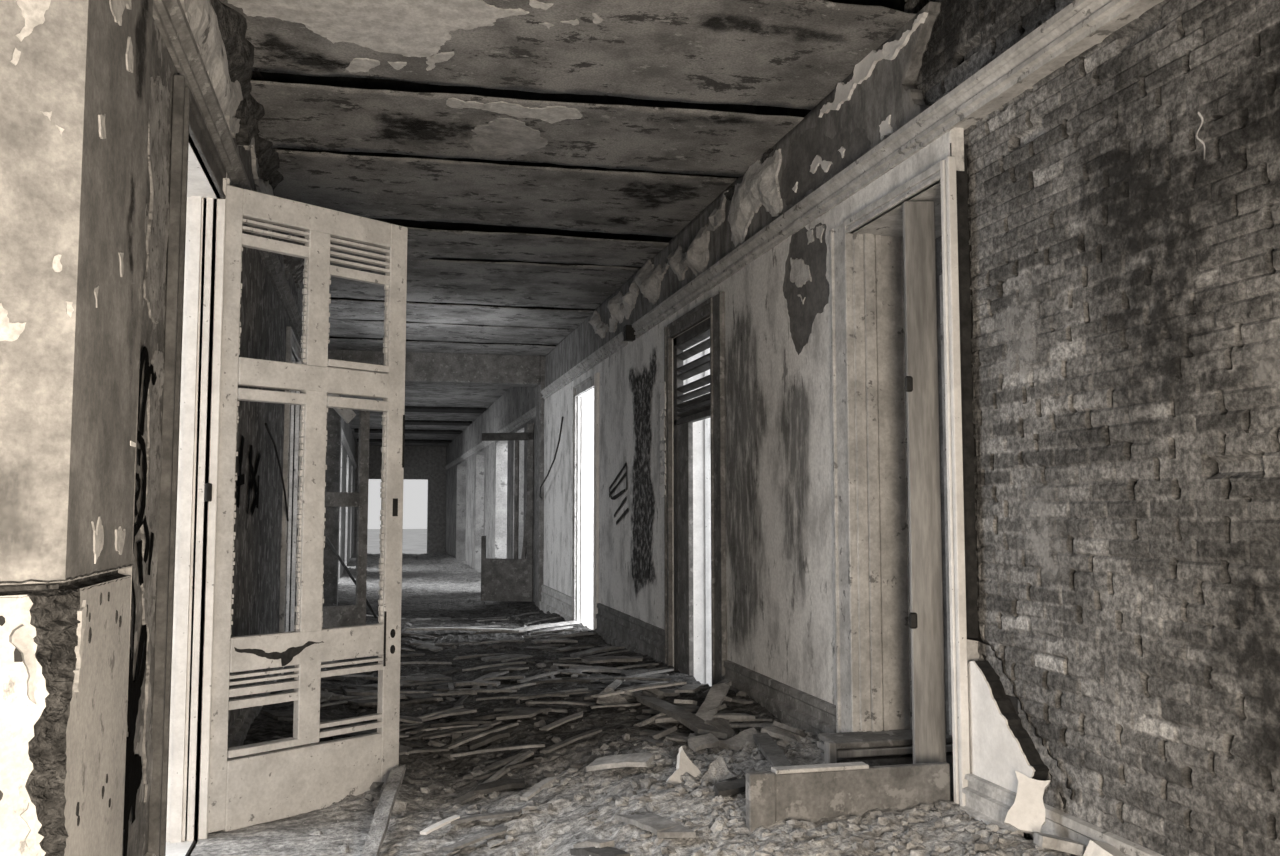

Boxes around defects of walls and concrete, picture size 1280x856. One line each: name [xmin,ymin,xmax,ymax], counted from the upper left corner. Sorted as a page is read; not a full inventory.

peeling [10,0,51,66]
spalling [272,224,305,288]
peeling [210,0,603,197]
leakage [377,114,475,141]
leakage [621,183,695,208]
spalling [589,186,735,339]
peeling [783,223,830,355]
peeling [761,12,928,206]
leakage [629,350,656,593]
leakage [710,316,765,639]
leakage [781,384,809,585]
spalling [9,589,87,856]